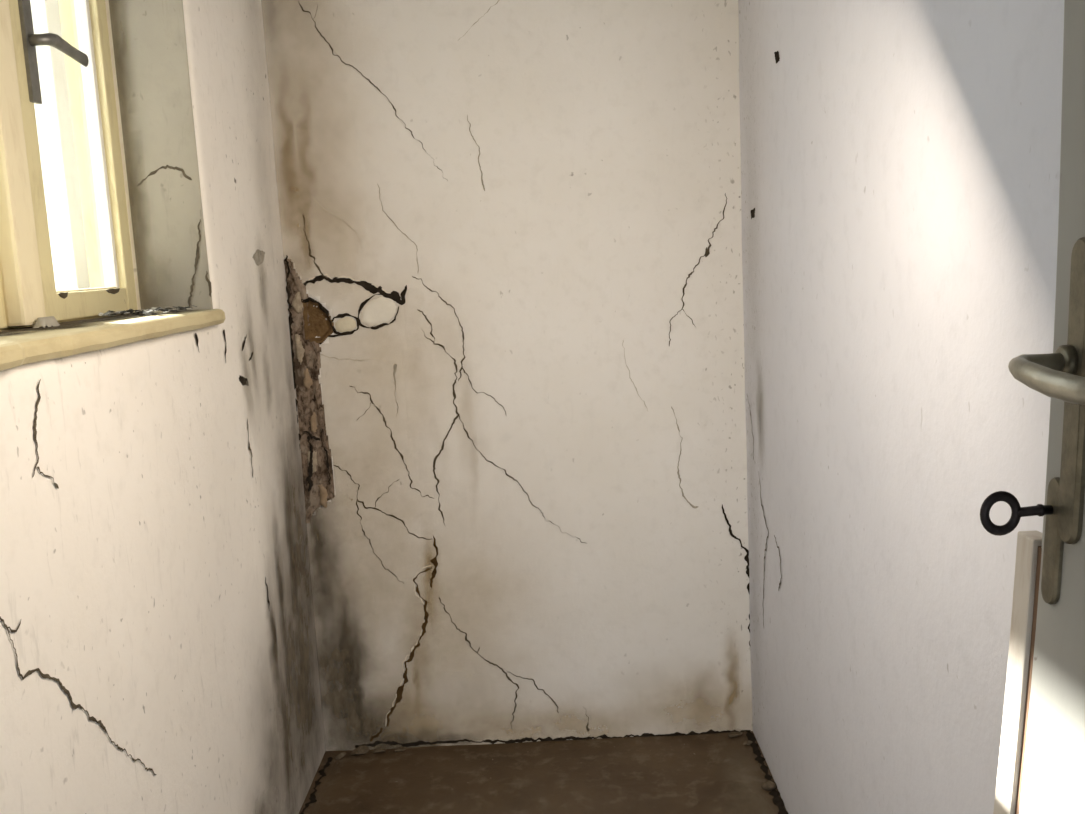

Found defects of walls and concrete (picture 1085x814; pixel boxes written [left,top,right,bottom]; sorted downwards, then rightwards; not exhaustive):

crack [298,1,448,181]
crack [467,115,485,191]
spalling [252,249,265,266]
spalling [284,259,397,523]
crack [285,184,788,814]
crack [0,617,156,775]
water stain [269,458,453,811]